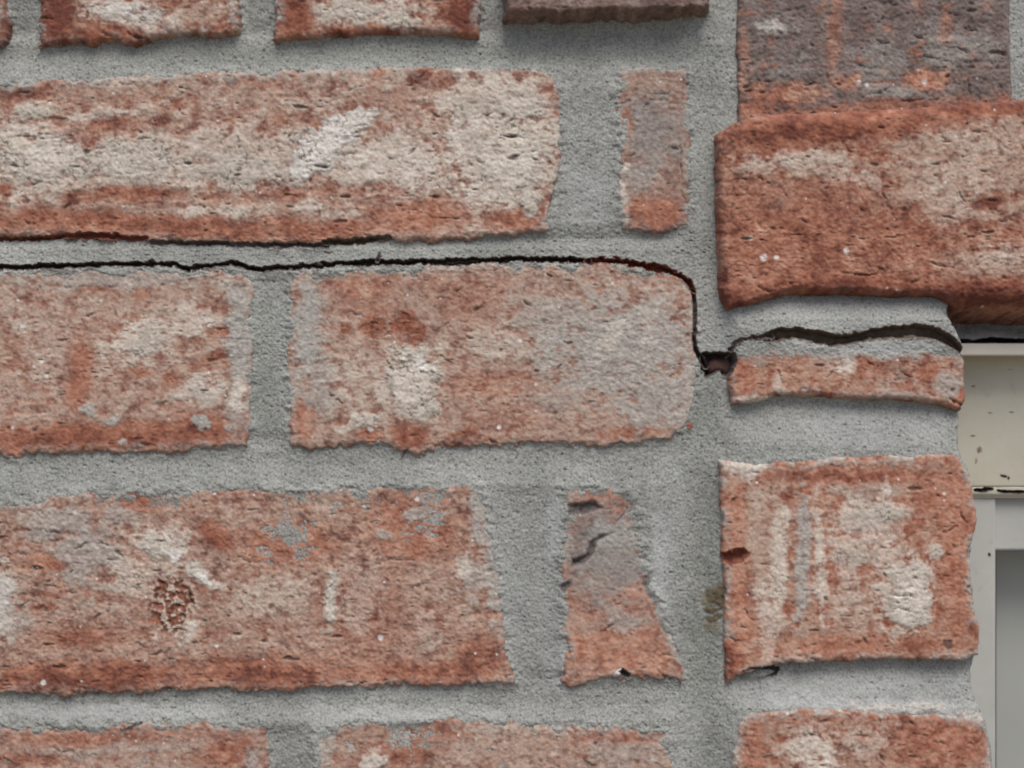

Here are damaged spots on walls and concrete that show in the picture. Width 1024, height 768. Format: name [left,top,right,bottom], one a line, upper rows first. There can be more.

crack [0,231,1024,370]
spalling [139,535,214,636]
spalling [720,547,750,566]